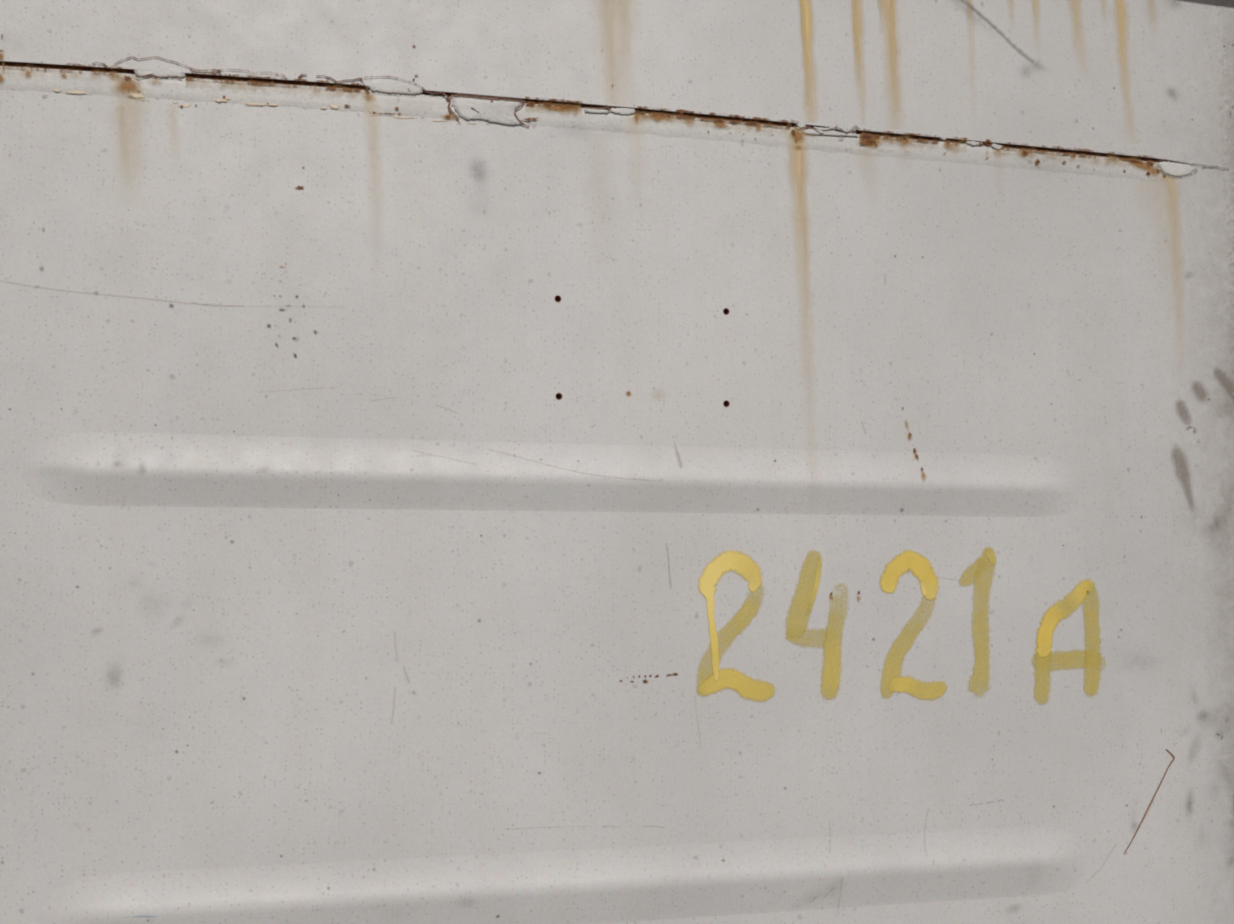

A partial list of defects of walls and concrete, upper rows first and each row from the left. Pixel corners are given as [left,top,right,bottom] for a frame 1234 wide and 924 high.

rust [0,34,140,96]
rust [800,0,812,85]
rust [1117,0,1125,62]
rust [186,72,402,115]
peeling [433,97,522,126]
rust [520,96,583,121]
rust [635,106,803,178]
rust [860,129,1166,177]
peeling [1158,161,1195,177]